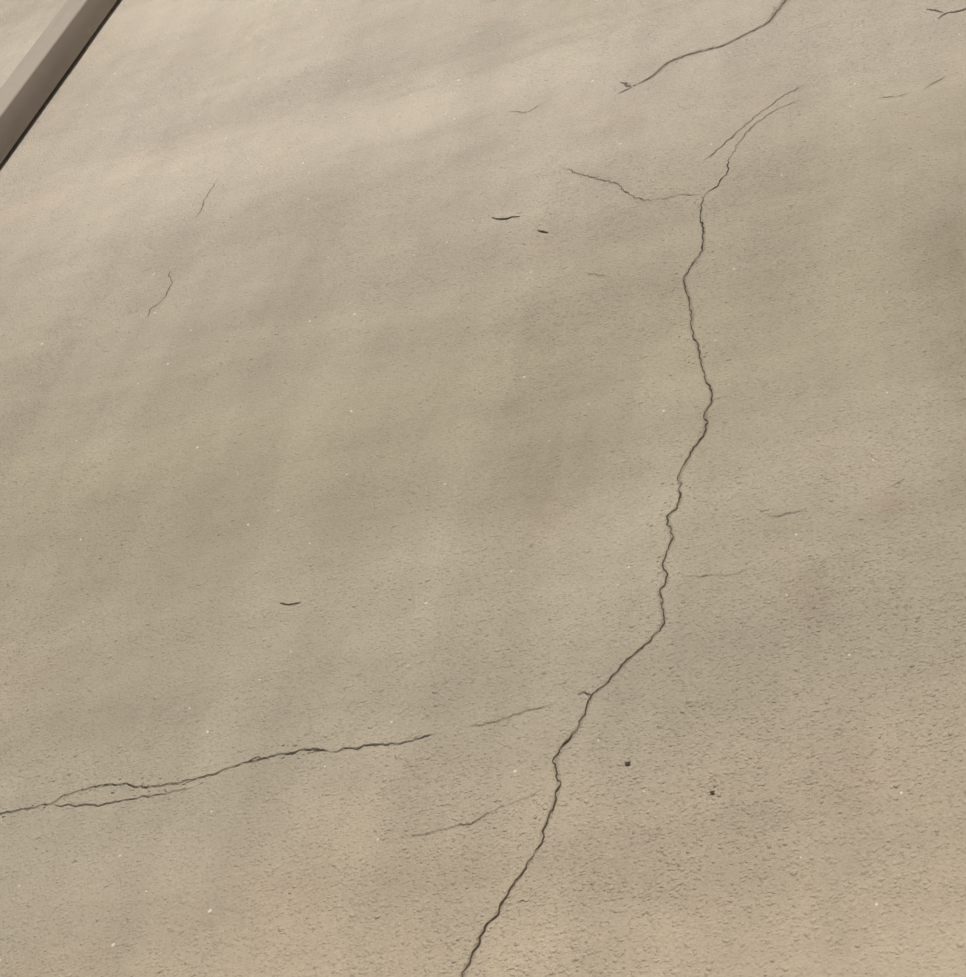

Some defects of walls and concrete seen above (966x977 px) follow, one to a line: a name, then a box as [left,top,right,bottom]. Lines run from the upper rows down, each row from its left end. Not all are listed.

crack [619,0,786,93]
crack [929,6,966,17]
crack [414,87,799,977]
crack [0,733,435,821]